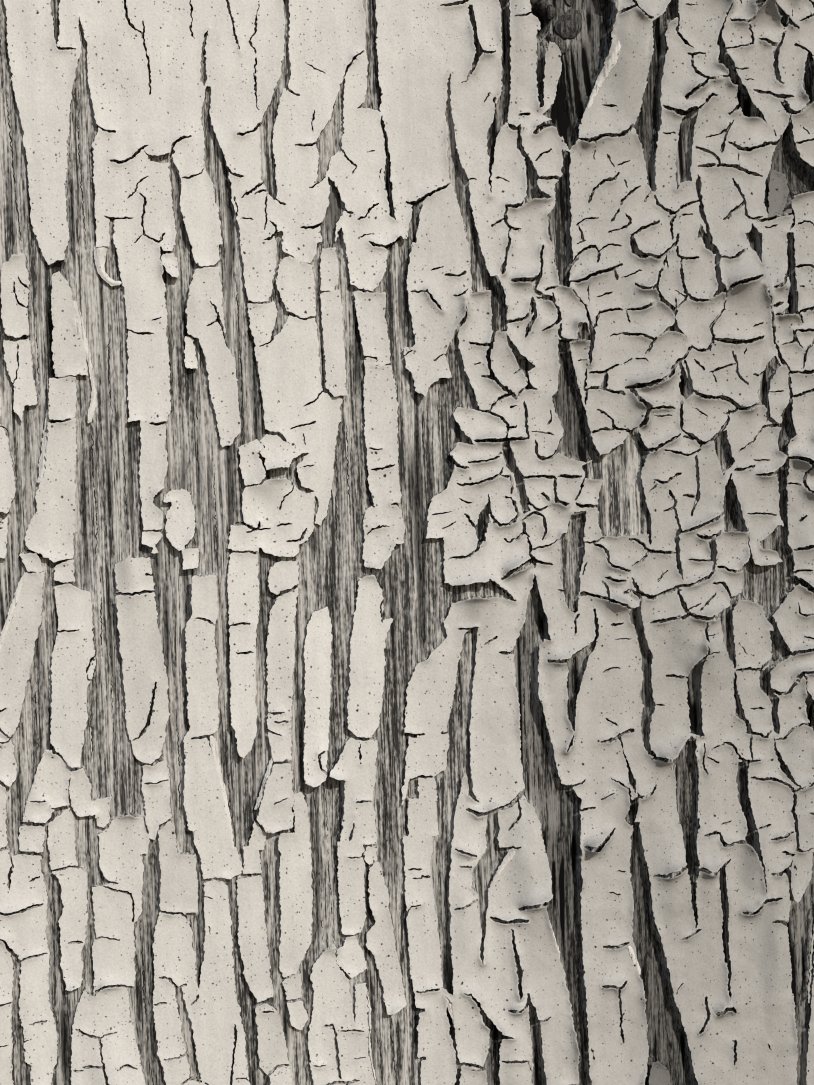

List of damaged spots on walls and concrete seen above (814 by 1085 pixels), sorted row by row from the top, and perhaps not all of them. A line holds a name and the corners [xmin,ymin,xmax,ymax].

crack [124,0,151,92]
peeling [0,0,814,587]
peeling [0,271,407,1085]
crack [458,627,536,814]
peeling [401,179,814,1085]
crack [707,647,809,789]
crack [150,1027,250,1085]